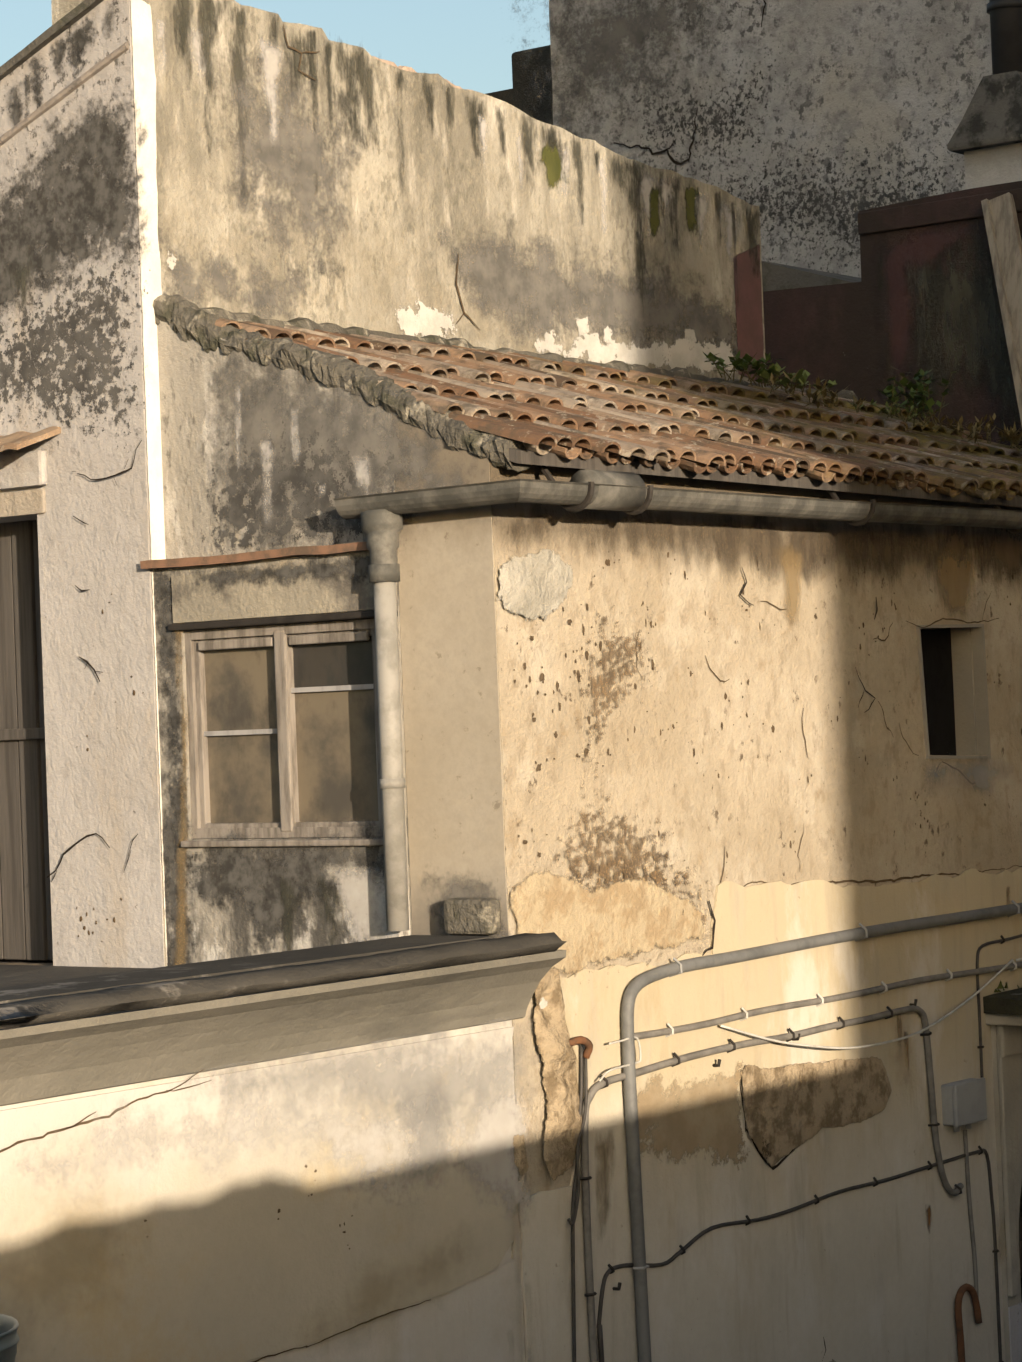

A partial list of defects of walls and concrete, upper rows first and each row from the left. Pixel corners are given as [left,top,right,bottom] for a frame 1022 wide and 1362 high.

damp [9,12,113,126]
damp [0,94,304,319]
damp [158,0,374,274]
damp [423,0,759,354]
crack [614,109,698,165]
peeling [395,299,457,339]
peeling [534,317,736,377]
damp [629,515,1022,619]
mould [153,569,385,966]
spalling [510,602,713,975]
crack [0,1069,212,1153]
spalling [637,1057,891,1170]